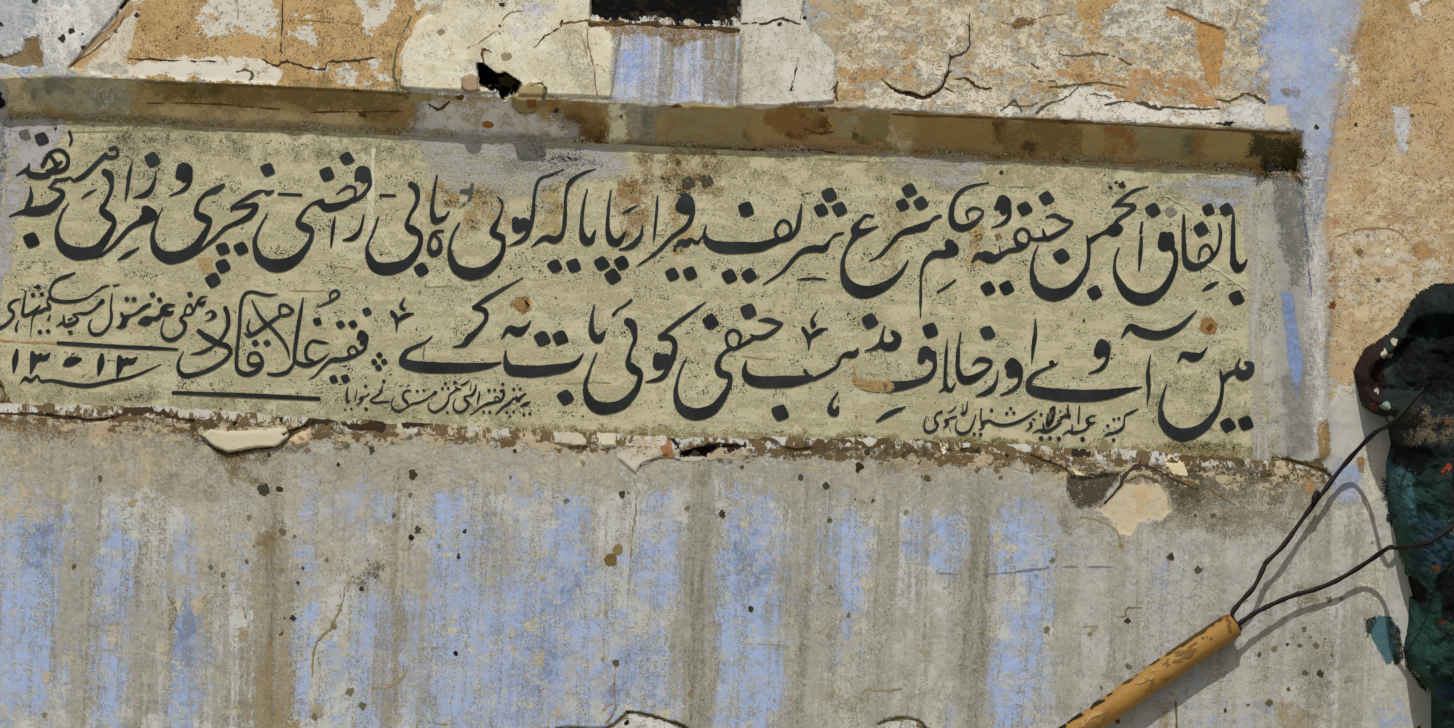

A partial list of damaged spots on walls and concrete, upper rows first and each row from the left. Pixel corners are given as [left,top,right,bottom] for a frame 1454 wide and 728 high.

peeling [0,35,44,67]
crack [882,13,1266,126]
peeling [1075,0,1119,47]
peeling [1164,6,1226,90]
peeling [1410,240,1440,261]
flaking render [1,405,312,452]
spalling [330,424,760,473]
spalling [778,442,1327,537]
crack [372,647,439,719]
crack [559,667,686,728]
crack [860,688,930,728]